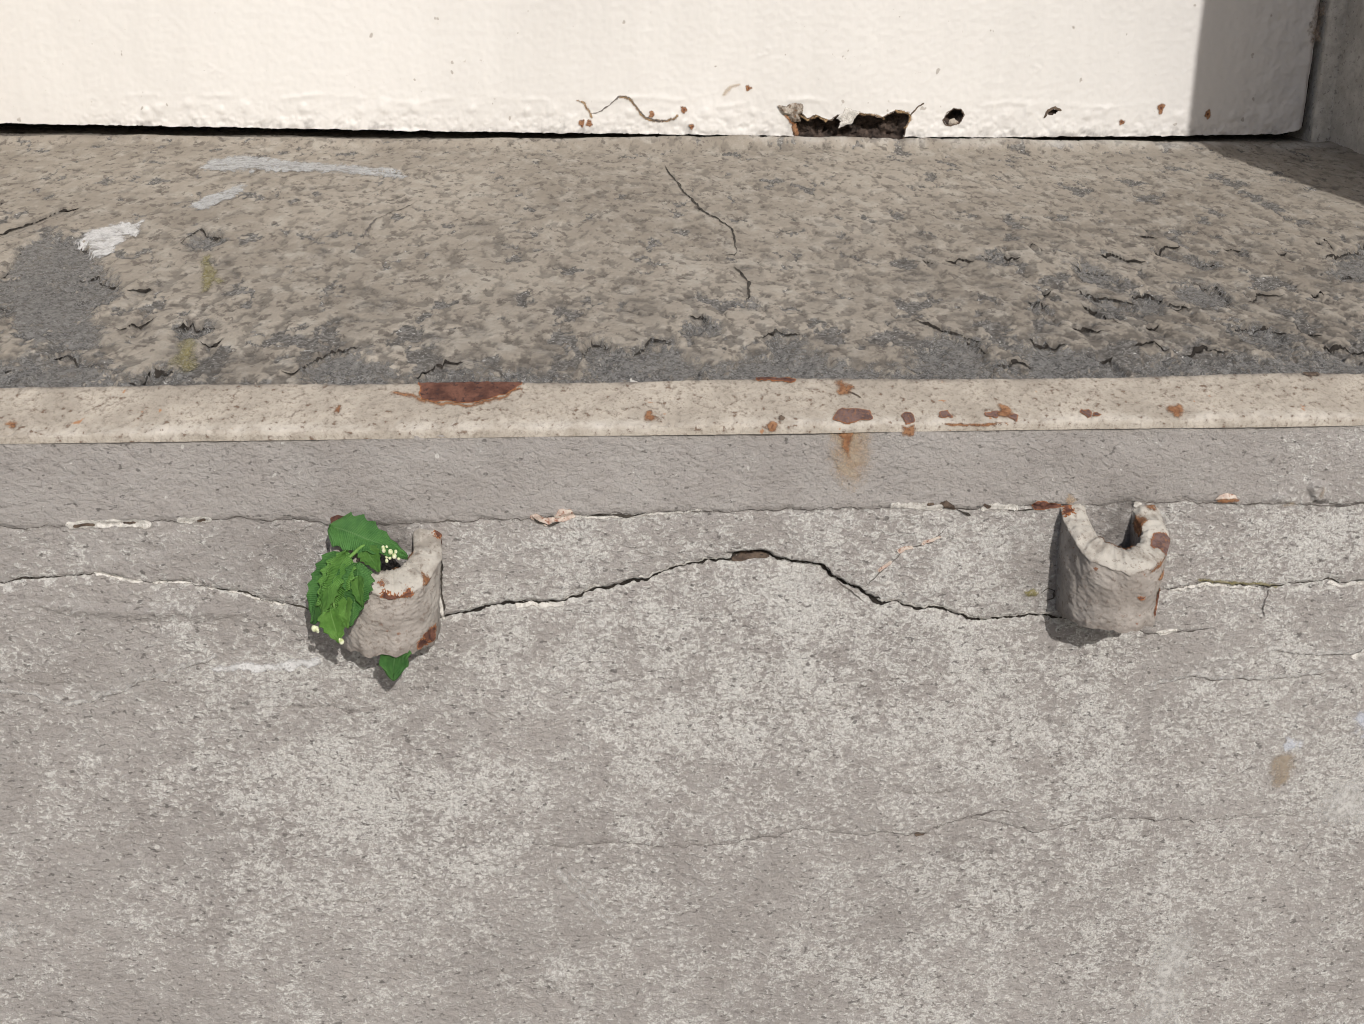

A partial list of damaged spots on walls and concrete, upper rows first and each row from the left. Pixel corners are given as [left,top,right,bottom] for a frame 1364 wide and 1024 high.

spalling [778,103,909,139]
crack [665,166,751,300]
spalling [0,208,188,388]
spalling [417,236,1364,383]
spalling [283,345,400,385]
corrosion [393,381,522,407]
corrosion [833,381,873,455]
corrosion [939,403,1018,427]
crack [379,507,889,525]
crack [0,572,309,610]
crack [440,508,1066,620]
corrosion [1137,532,1170,616]